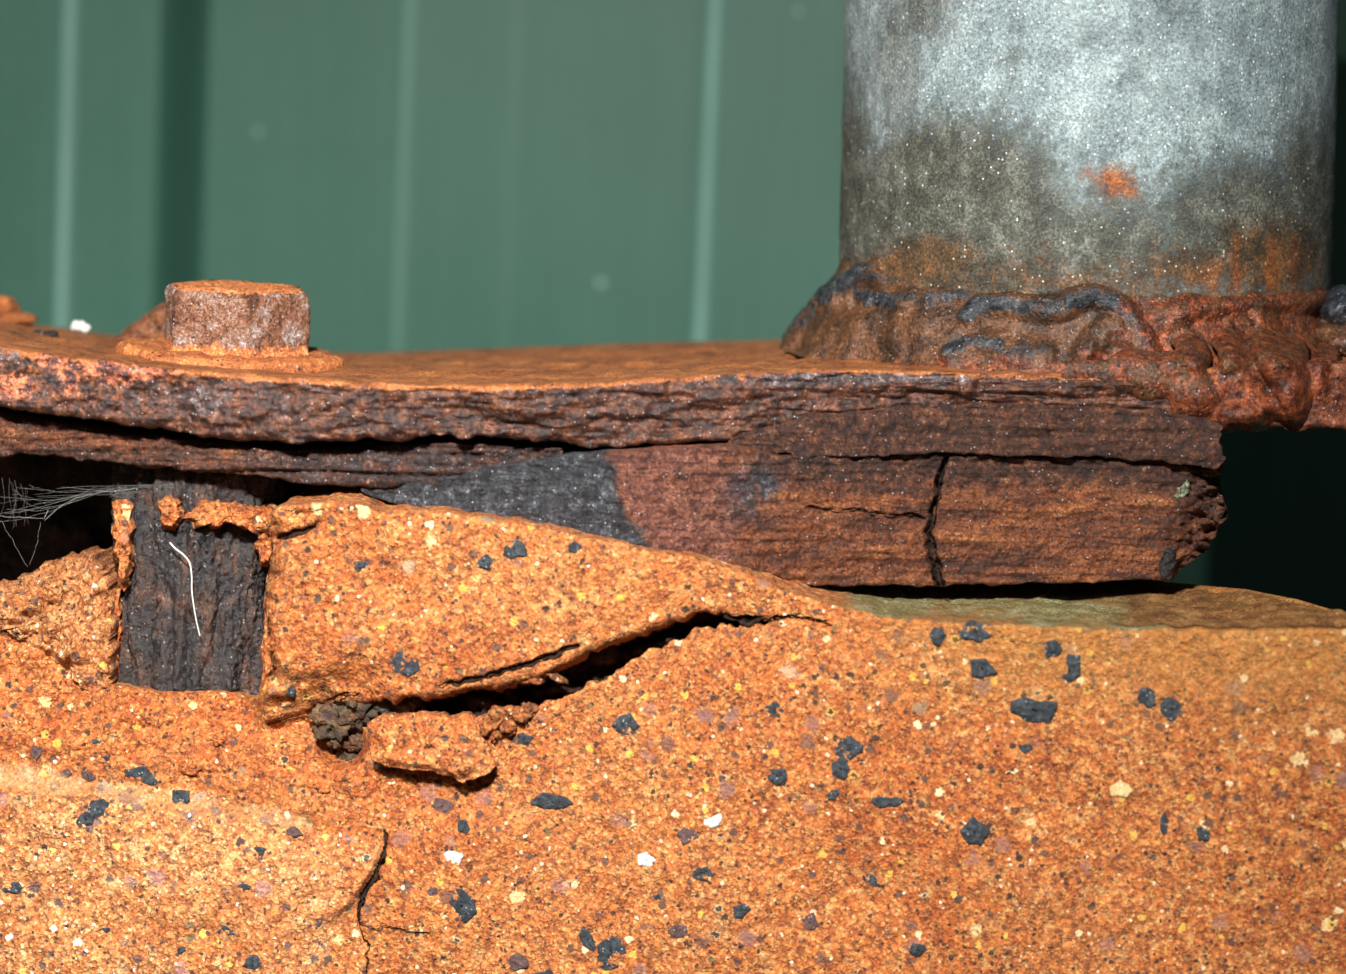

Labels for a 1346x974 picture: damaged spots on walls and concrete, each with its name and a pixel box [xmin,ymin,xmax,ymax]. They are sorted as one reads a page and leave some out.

corrosion [1098,170,1136,197]
crack [806,457,948,587]
spalling [0,546,383,797]
crack [320,612,830,717]
crack [356,831,427,973]